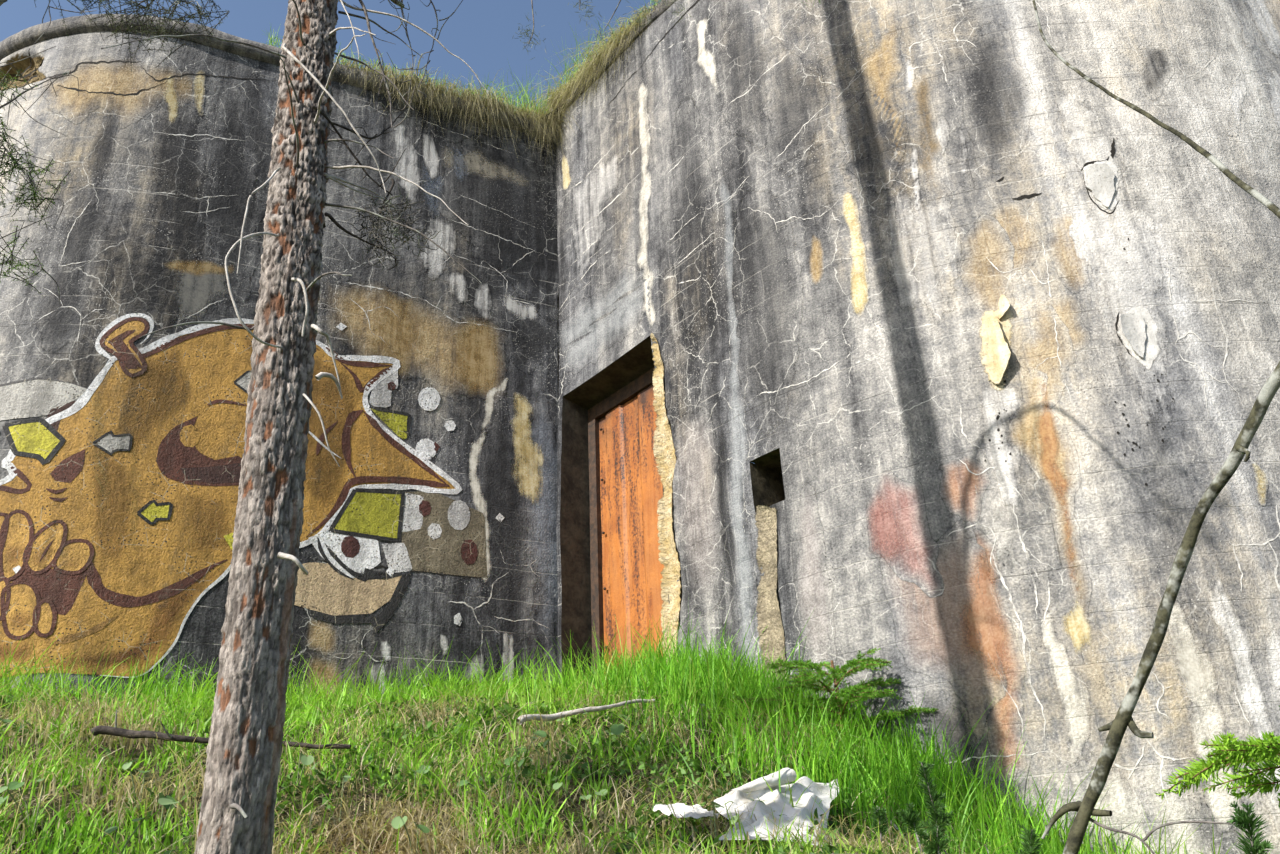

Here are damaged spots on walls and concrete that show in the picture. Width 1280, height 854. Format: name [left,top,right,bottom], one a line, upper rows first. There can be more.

spalling [0,49,46,90]
crack [42,202,109,341]
damp [41,56,273,327]
crack [44,60,279,96]
damp [321,81,656,685]
spalling [650,333,682,665]
damp [669,98,824,672]
crack [667,176,875,284]
rust [879,456,1027,781]
peeling [980,294,1013,391]
damp [840,0,1174,423]
rust [1006,368,1092,622]